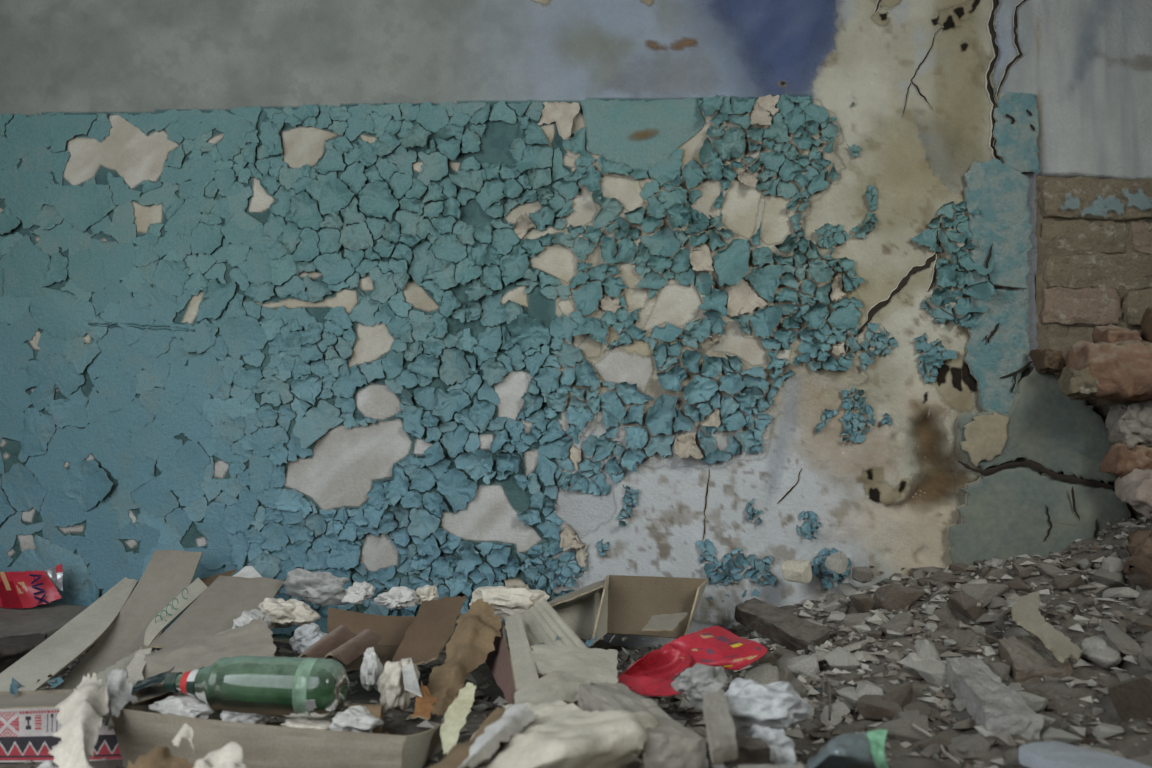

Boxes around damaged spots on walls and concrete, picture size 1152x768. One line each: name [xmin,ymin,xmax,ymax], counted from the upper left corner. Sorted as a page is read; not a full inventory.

damp [647,38,697,49]
crack [902,26,944,116]
crack [985,0,1035,164]
peeling [0,112,296,607]
flaking render [131,0,1152,633]
crack [846,230,940,352]
crack [958,460,1115,541]